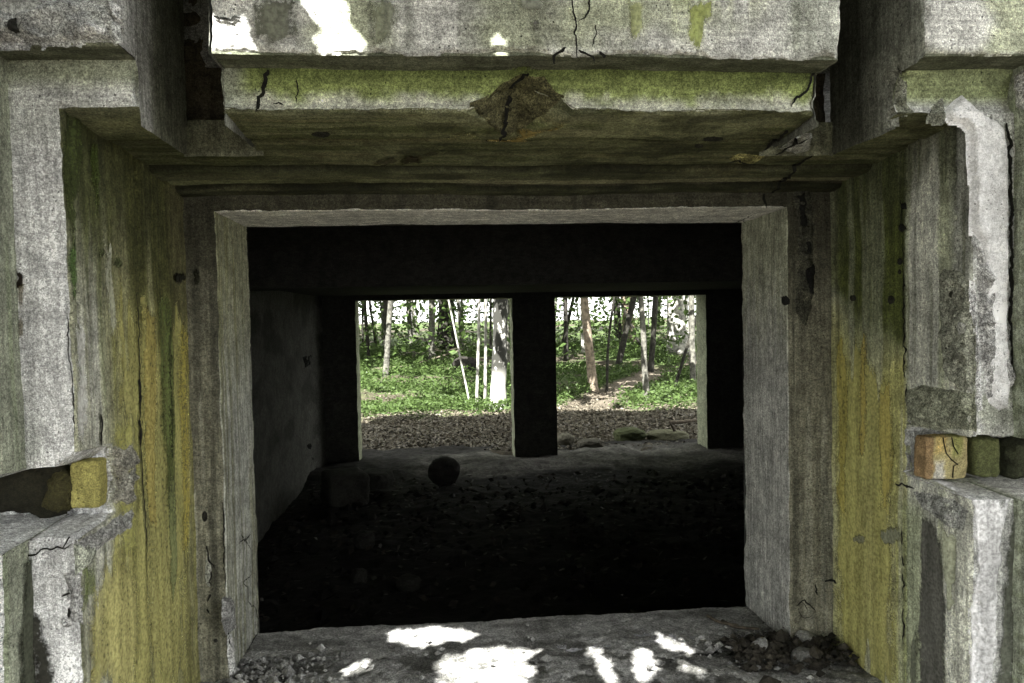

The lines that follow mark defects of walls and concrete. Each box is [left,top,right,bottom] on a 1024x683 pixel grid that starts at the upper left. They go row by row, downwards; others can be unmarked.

crack [256,70,299,111]
spalling [470,73,564,142]
crack [552,0,606,64]
spalling [926,98,946,126]
leakage [174,269,200,285]
crack [1006,123,1014,385]
leakage [76,318,88,439]
spalling [905,269,977,432]
leakage [116,297,190,600]
crack [28,527,84,557]
spalling [60,443,140,627]
leakage [90,501,138,683]